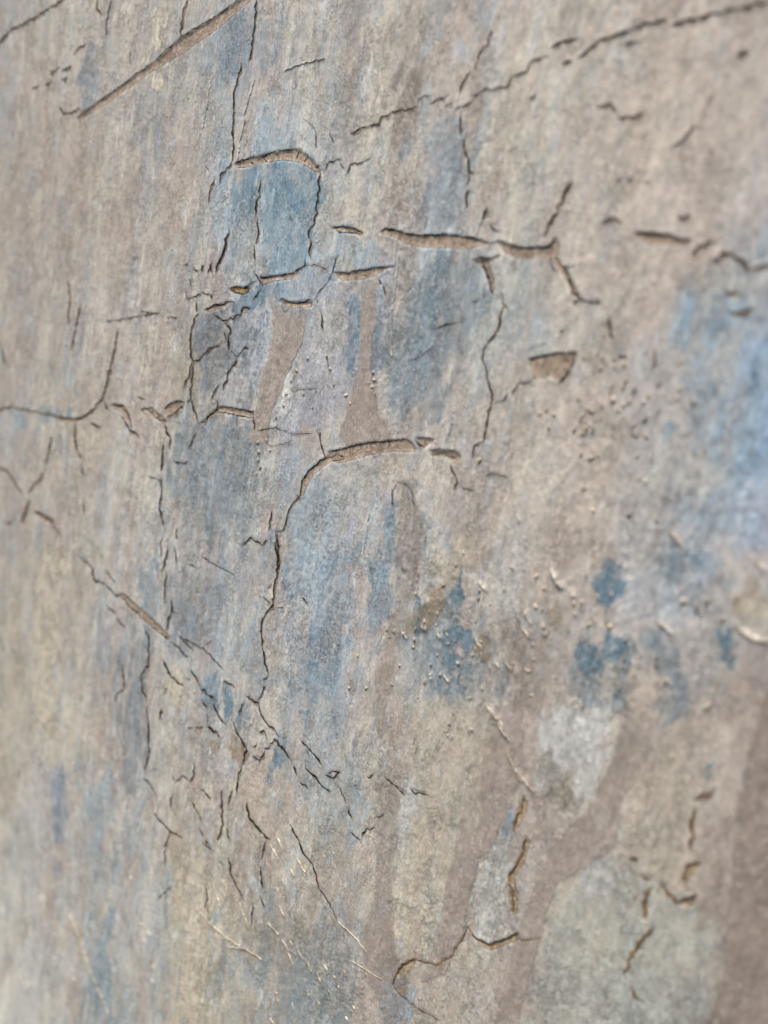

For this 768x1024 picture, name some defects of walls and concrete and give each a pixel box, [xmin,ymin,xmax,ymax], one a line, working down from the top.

crack [351,1,768,491]
crack [0,0,396,942]
flaking render [512,352,577,393]
crack [368,775,430,797]
crack [392,797,541,1021]